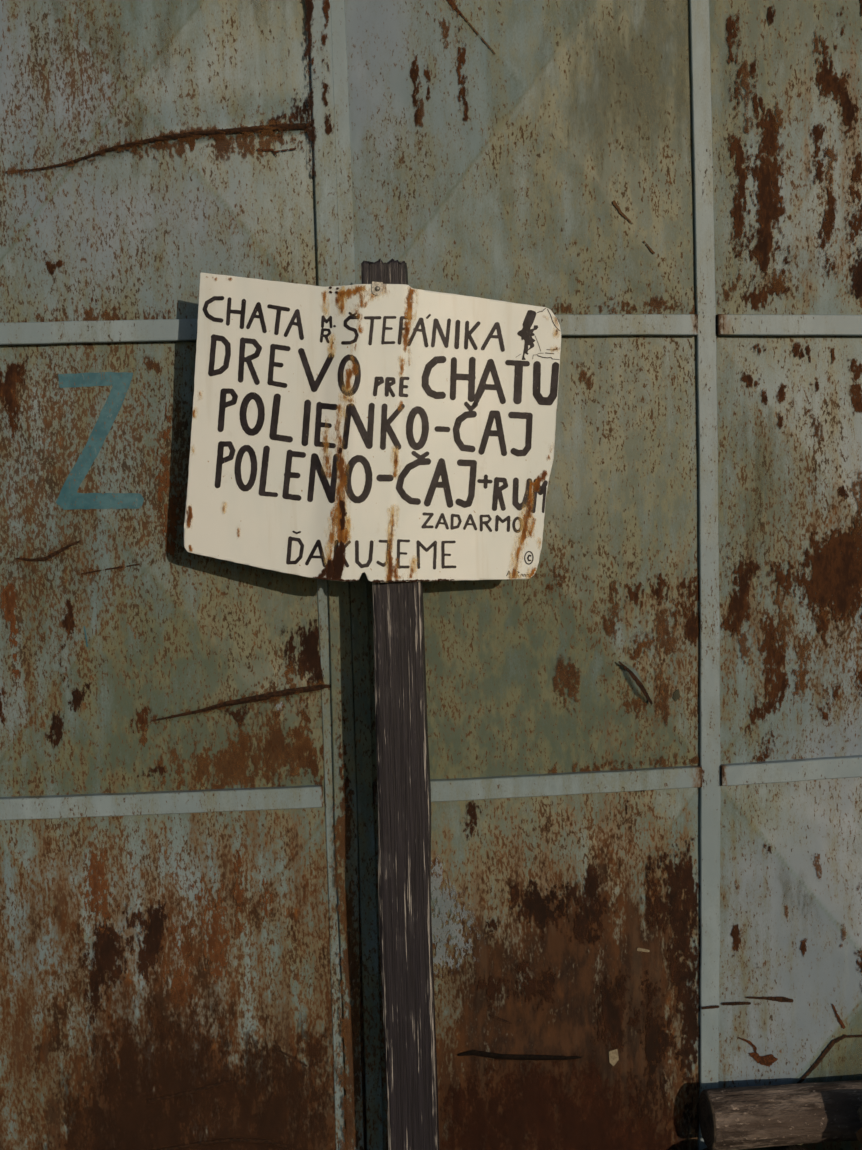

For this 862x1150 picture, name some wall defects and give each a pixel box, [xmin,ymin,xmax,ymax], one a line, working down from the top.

crack [2,120,312,177]
corrosion [120,0,332,176]
corrosion [410,54,431,127]
corrosion [717,14,791,311]
corrosion [809,123,862,300]
corrosion [813,7,861,138]
crack [150,680,331,725]
corrosion [720,471,862,762]
corrosion [47,619,363,1150]
crack [458,1050,581,1060]
corrosion [508,864,615,953]
corrosion [593,838,700,1133]